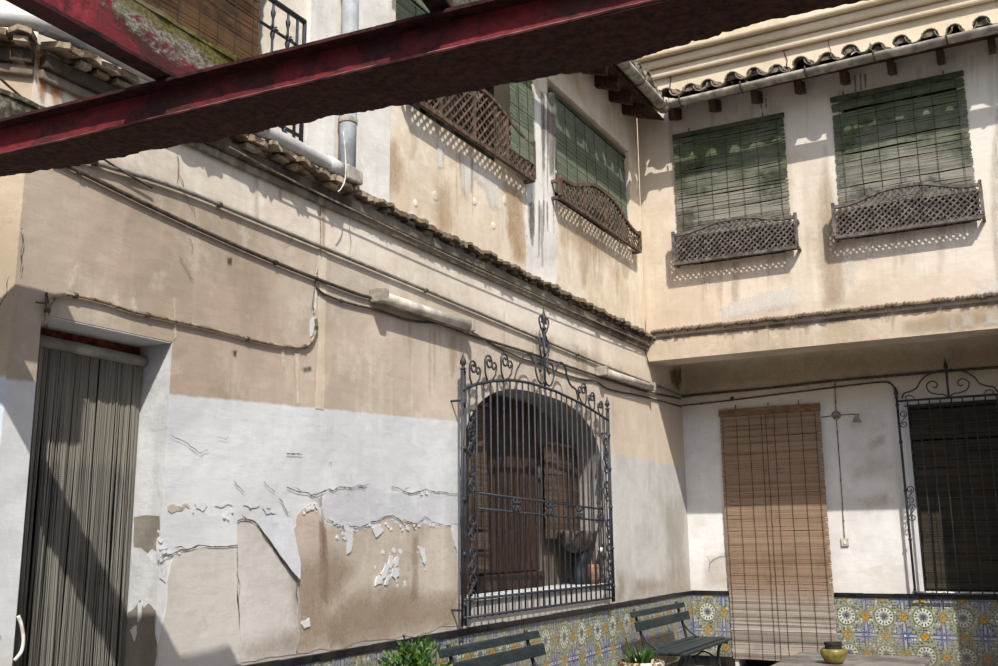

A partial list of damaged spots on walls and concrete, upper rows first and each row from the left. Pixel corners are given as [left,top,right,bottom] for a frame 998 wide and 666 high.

rust [36,51,61,97]
damp [528,92,556,180]
crack [0,229,24,305]
damp [981,281,998,294]
flaking render [121,483,460,666]